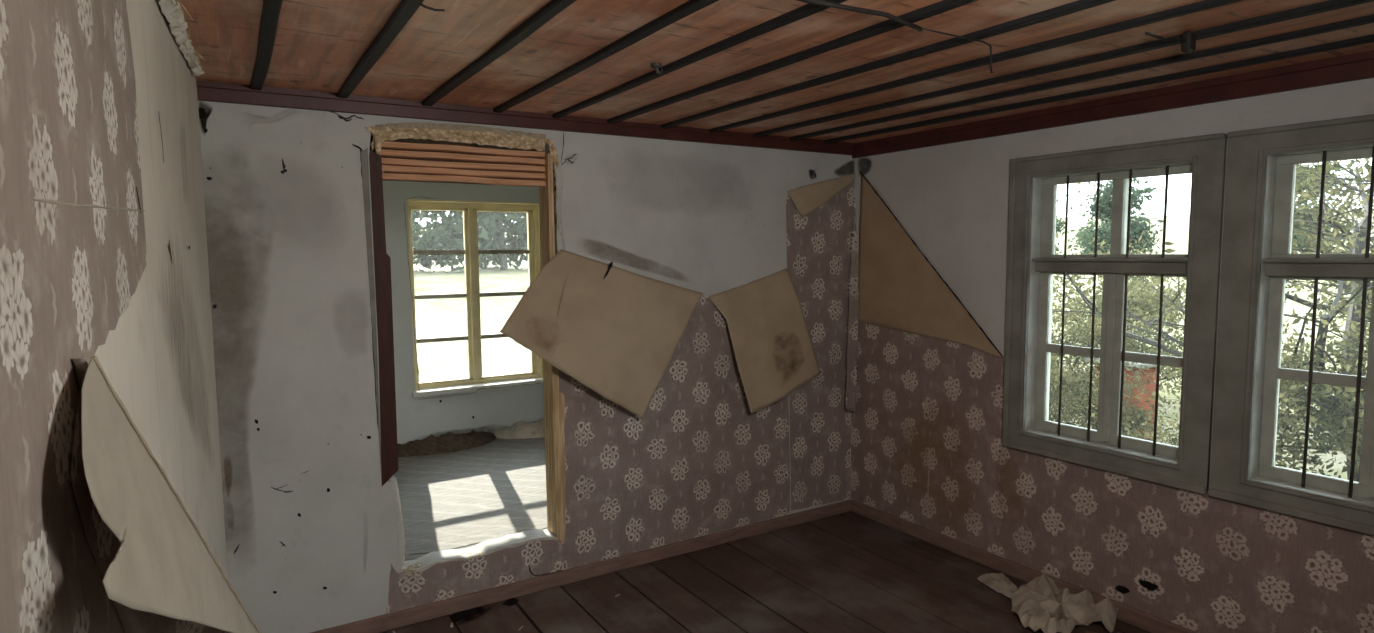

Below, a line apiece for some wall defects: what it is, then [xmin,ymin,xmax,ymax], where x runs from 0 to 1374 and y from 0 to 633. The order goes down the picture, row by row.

spalling [158,0,206,76]